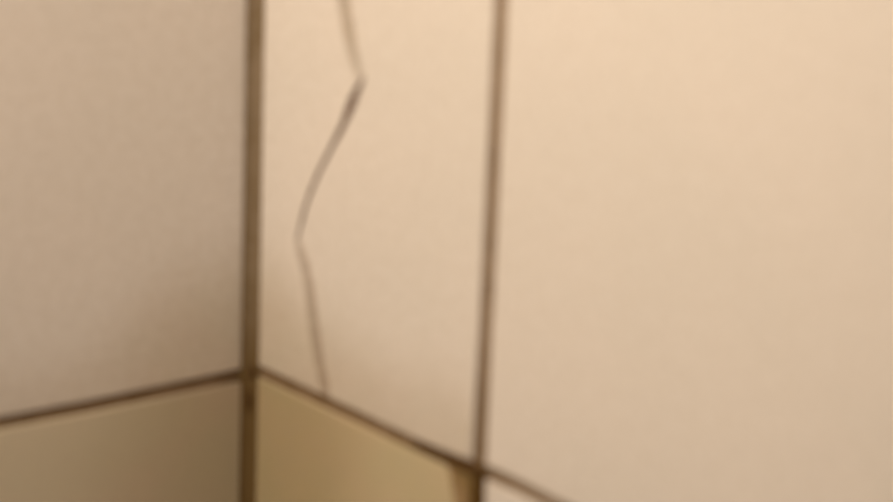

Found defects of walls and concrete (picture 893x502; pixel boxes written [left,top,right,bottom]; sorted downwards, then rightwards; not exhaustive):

crack [297,76,365,240]